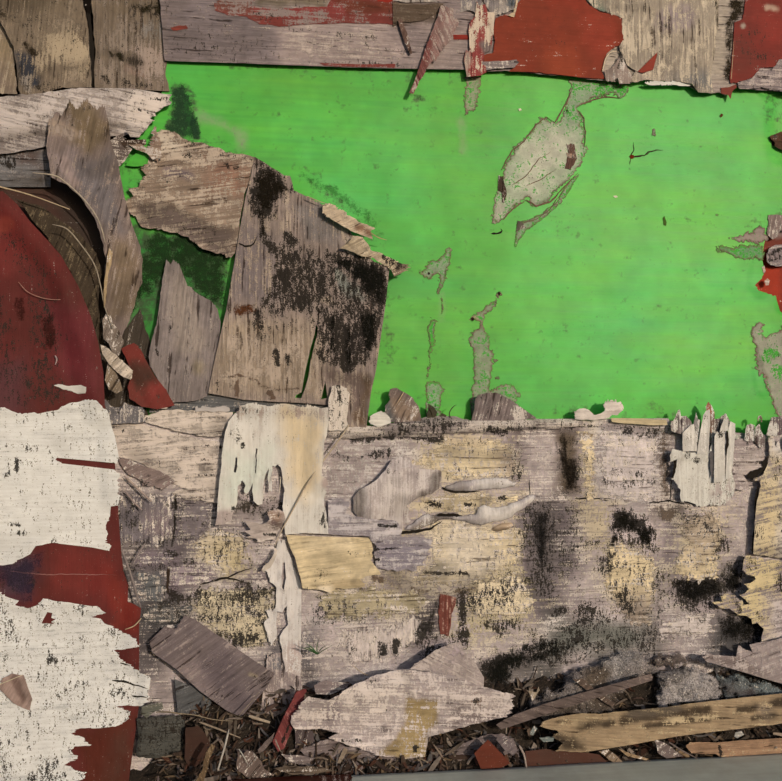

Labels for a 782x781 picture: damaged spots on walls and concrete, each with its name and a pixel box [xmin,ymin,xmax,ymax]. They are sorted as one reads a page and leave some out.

peeling [214,0,393,27]
peeling [491,53,632,247]
leakage [256,171,287,235]
peeling [716,215,782,285]
leakage [337,258,386,301]
leakage [361,313,376,351]
peeling [468,292,521,415]
peeling [750,322,782,417]
peeling [118,457,178,490]
leakage [607,511,653,554]
leakage [674,572,742,601]
leakage [486,640,578,683]